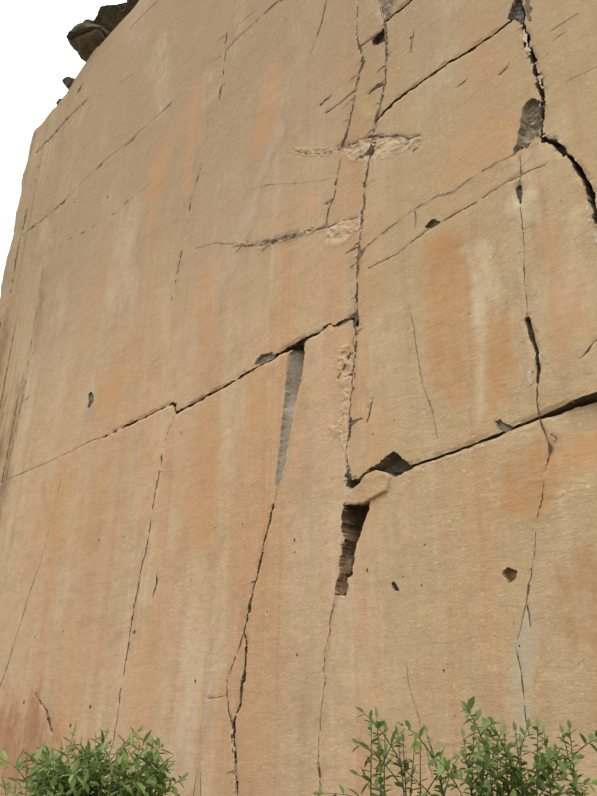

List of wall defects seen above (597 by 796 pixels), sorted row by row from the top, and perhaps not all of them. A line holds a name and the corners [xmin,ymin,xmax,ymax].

crack [0,0,597,490]
spalling [288,146,335,159]
spalling [513,98,544,154]
crack [111,455,163,748]
crack [208,493,277,796]
crack [317,599,335,796]
spalling [335,501,370,597]
spalling [344,451,414,489]
crack [401,264,597,741]